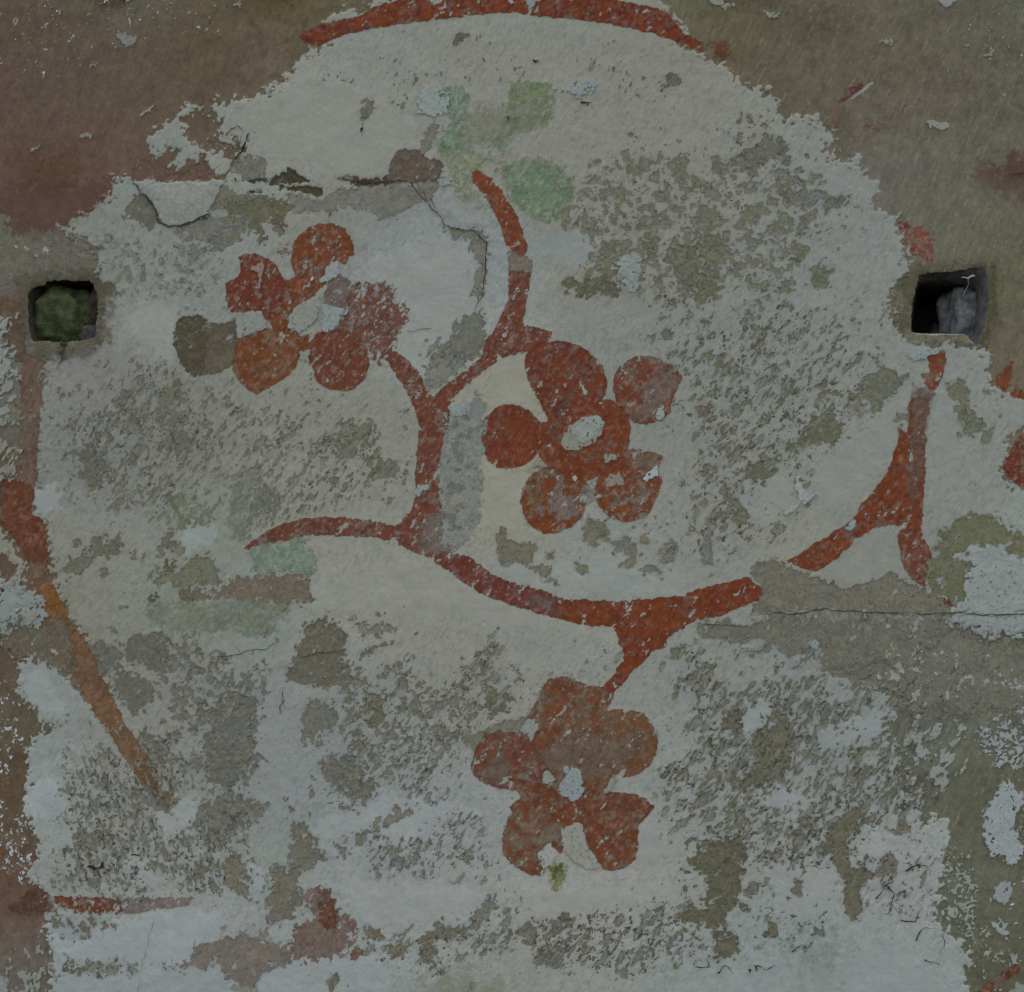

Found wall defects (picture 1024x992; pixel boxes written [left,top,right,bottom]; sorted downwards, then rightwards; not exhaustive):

peeling [6,0,98,83]
peeling [652,72,681,108]
crack [119,176,211,227]
crack [336,178,498,310]
peeling [0,32,491,613]
peeling [550,112,1001,581]
crack [705,608,1024,628]
peeling [0,511,1024,992]